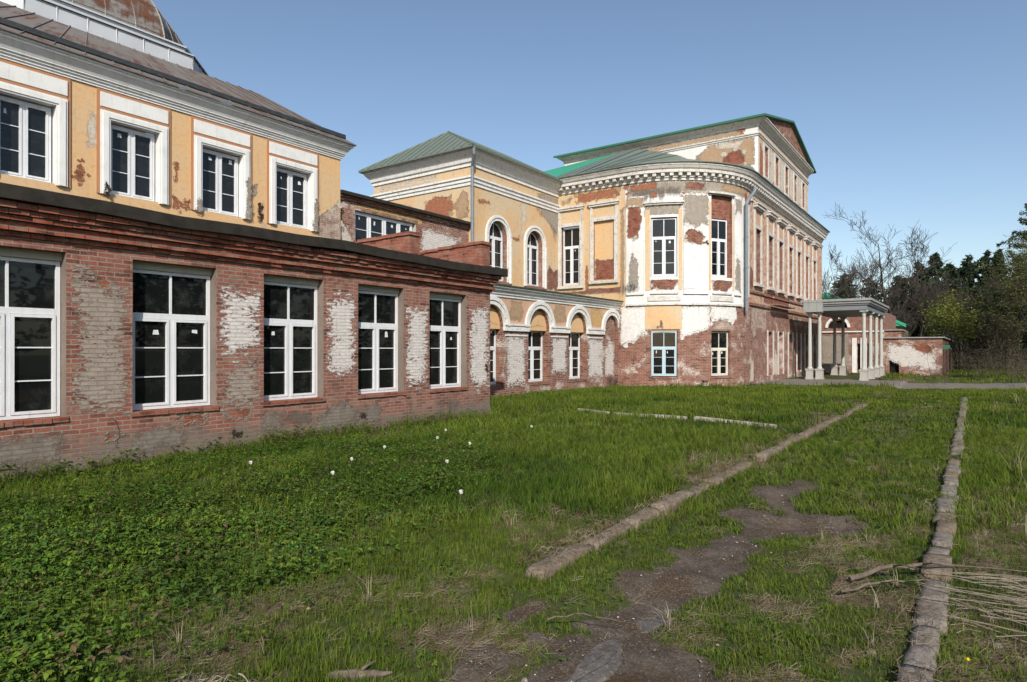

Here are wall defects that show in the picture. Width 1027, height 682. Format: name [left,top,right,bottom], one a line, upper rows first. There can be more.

corrosion [124,0,156,21]
peeling [71,110,97,186]
peeling [418,191,490,252]
flaking render [546,180,747,323]
peeling [71,264,129,417]
peeling [171,286,261,438]
peeling [326,290,356,377]
peeling [406,306,428,390]
peeling [469,305,490,394]
peeling [551,337,568,375]
peeling [587,320,663,379]
peeling [886,342,939,373]